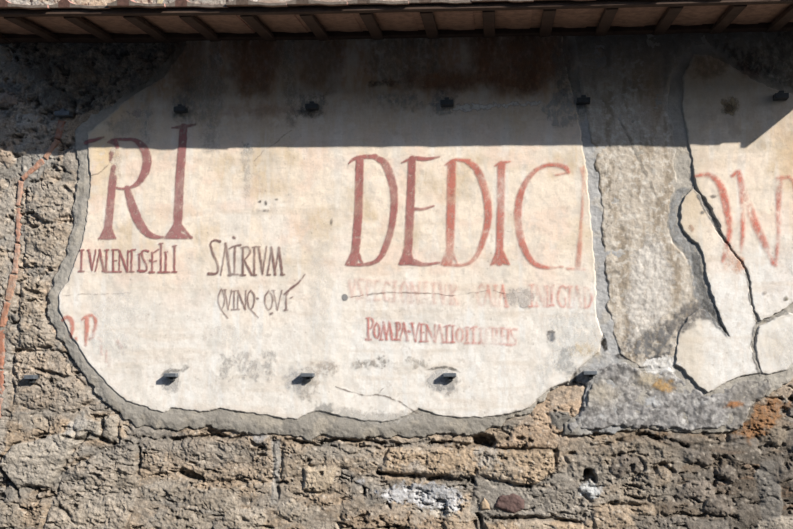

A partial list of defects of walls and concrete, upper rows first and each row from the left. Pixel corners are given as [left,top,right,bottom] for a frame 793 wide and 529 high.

spalling [669,188,727,336]
crack [692,187,786,376]